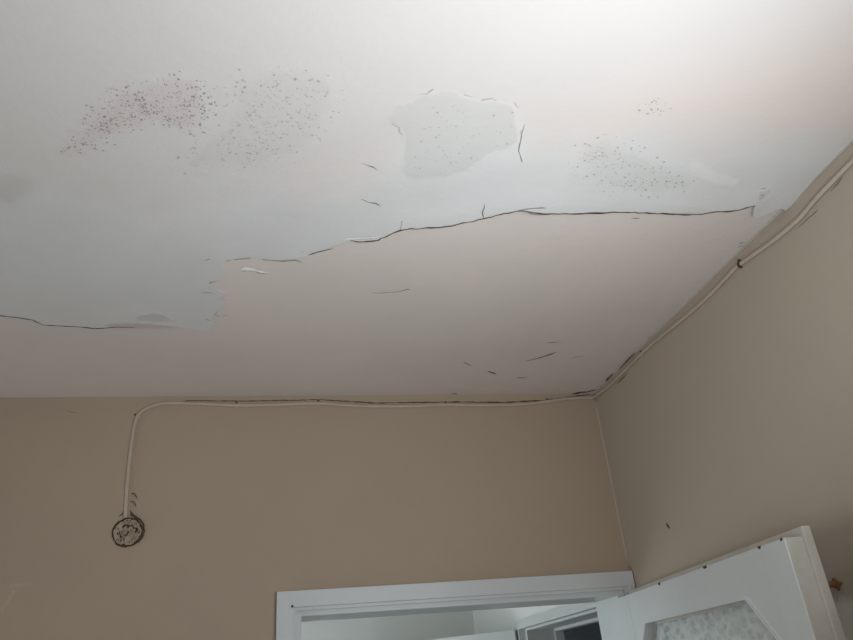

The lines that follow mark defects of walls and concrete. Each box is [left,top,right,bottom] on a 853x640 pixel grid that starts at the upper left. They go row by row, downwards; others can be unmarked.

leakage [55,55,353,174]
flaking render [0,63,853,332]
leakage [387,88,522,180]
leakage [560,126,705,202]